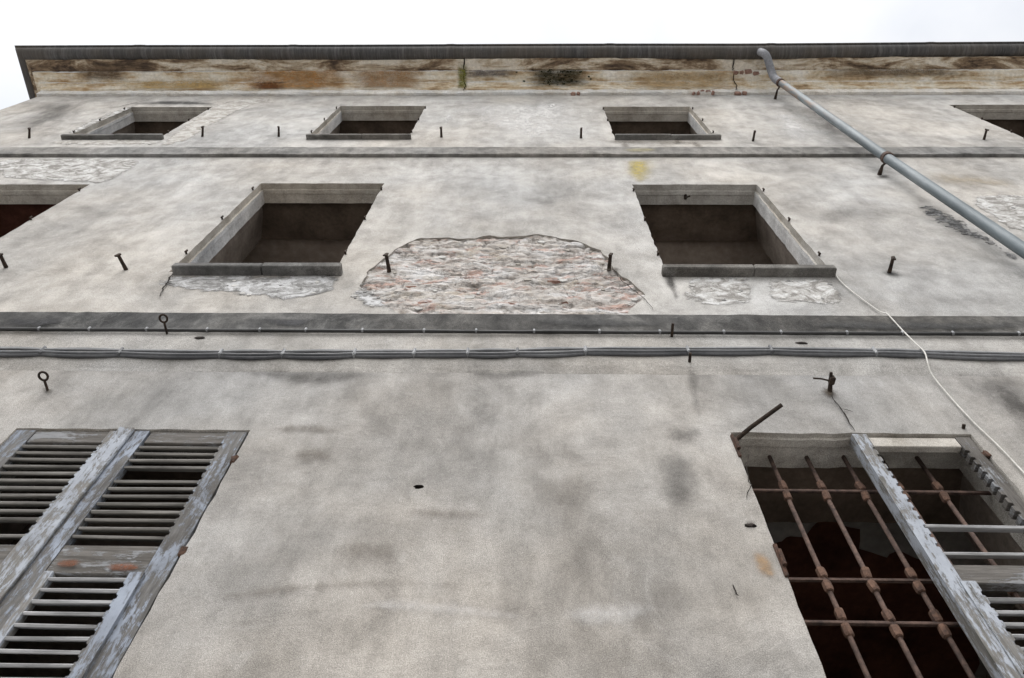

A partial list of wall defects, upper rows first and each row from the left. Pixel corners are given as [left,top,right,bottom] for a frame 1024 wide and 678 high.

flaking render [0,158,138,183]
flaking render [975,194,1024,230]
spalling [920,206,1016,259]
flaking render [159,275,338,300]
spalling [350,234,645,315]
flaking render [685,277,751,305]
flaking render [768,279,841,304]